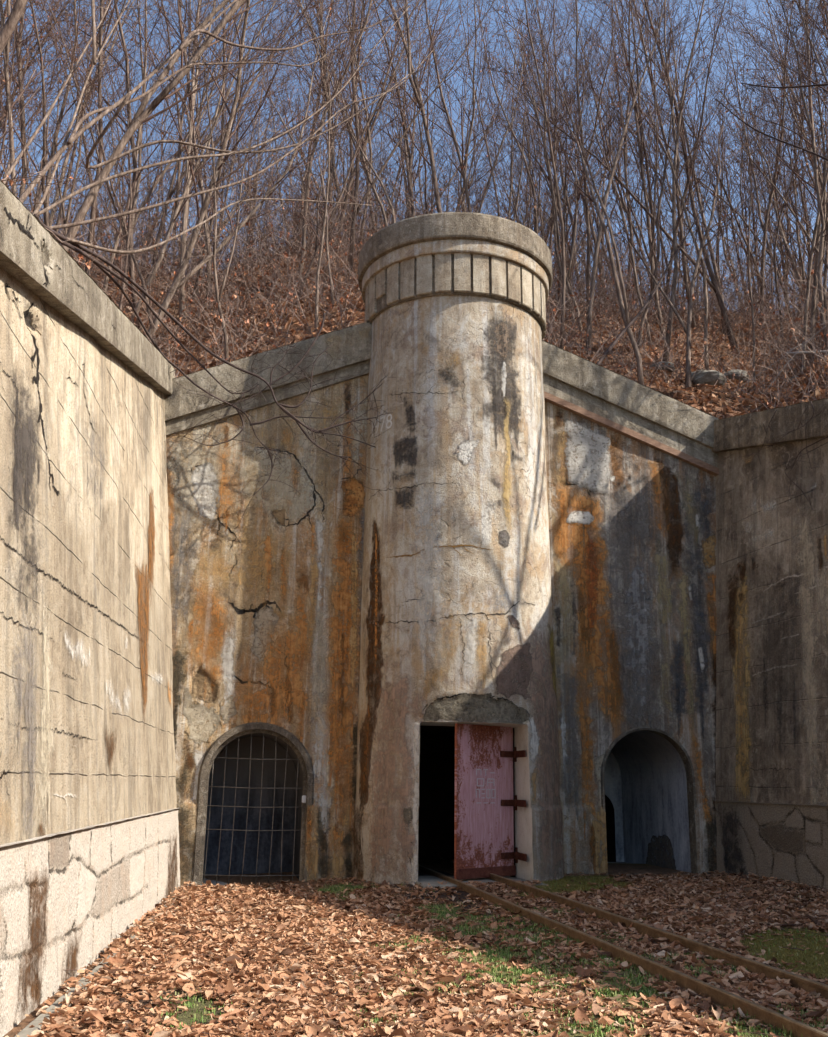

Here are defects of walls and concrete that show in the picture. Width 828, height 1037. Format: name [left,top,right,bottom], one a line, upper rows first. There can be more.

leakage [12,378,40,612]
crack [0,207,87,499]
peeling [191,462,221,521]
leakage [392,399,417,509]
leakage [481,316,522,522]
peeling [564,419,615,494]
crack [226,569,289,710]
corrosion [237,523,312,741]
corrosion [327,516,385,843]
crack [386,586,535,710]
spalling [423,643,533,724]
corrosion [554,488,623,722]